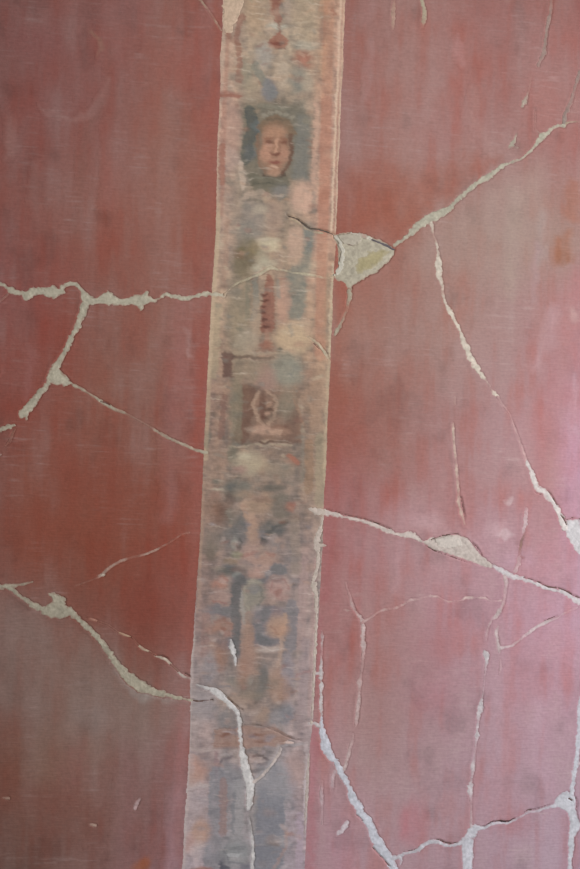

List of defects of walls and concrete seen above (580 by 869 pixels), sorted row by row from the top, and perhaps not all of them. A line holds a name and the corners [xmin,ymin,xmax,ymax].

peeling [222,0,244,34]
flaking render [330,232,395,289]
crack [393,0,580,531]
crack [0,266,352,454]
crack [323,396,466,543]
flaking render [423,535,493,568]
crack [0,532,580,869]